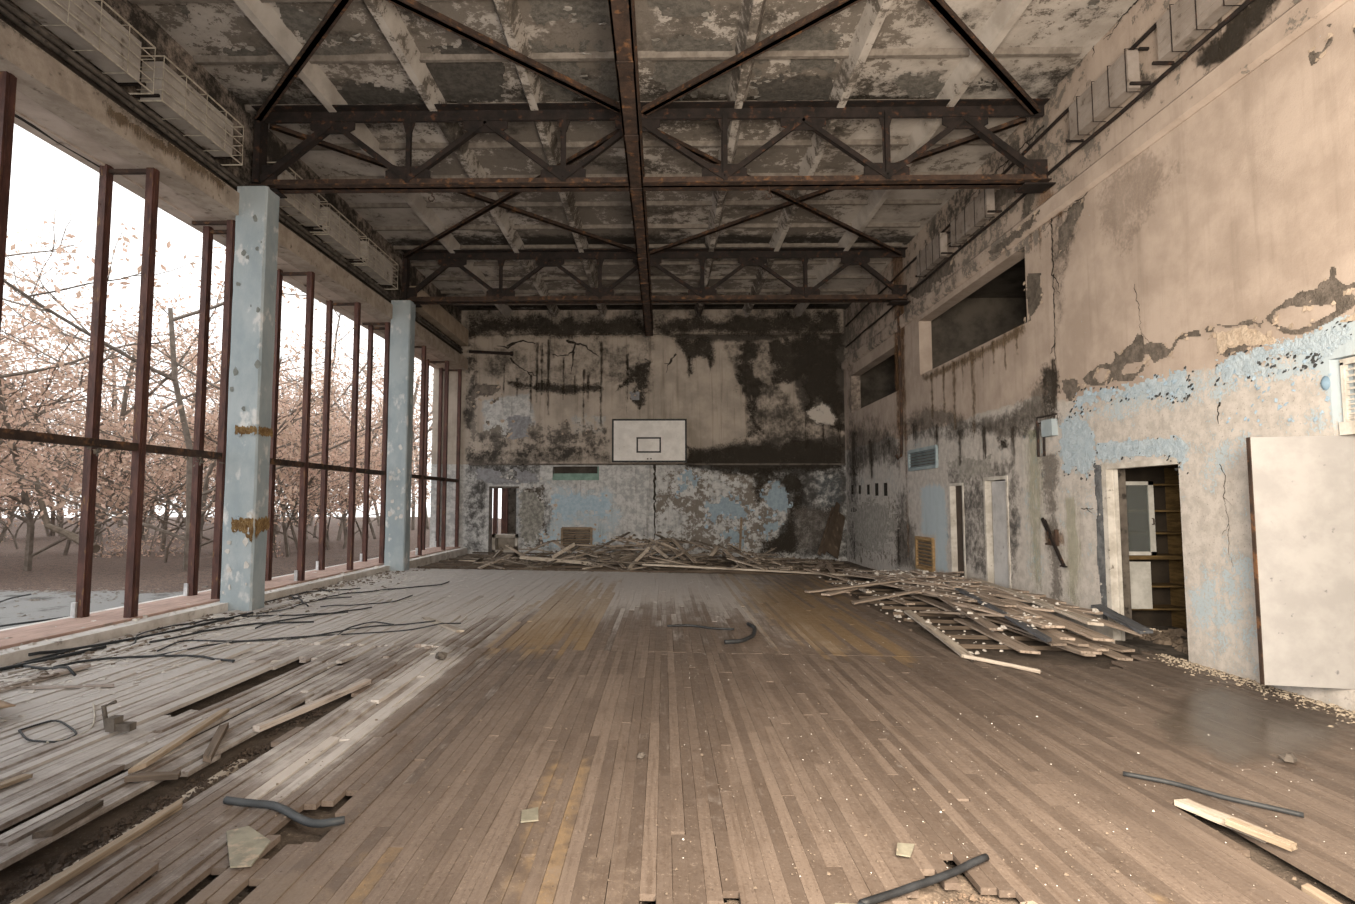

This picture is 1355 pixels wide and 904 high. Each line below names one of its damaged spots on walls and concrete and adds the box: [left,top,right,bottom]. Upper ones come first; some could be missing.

peeling [215,46,279,82]
peeling [276,2,424,105]
peeling [426,39,512,104]
peeling [528,0,619,102]
peeling [647,0,733,101]
peeling [749,26,843,101]
peeling [891,71,945,98]
water stain [1198,0,1273,64]
water stain [466,304,1060,557]
corrosion [894,305,907,483]
peeling [1058,267,1355,620]